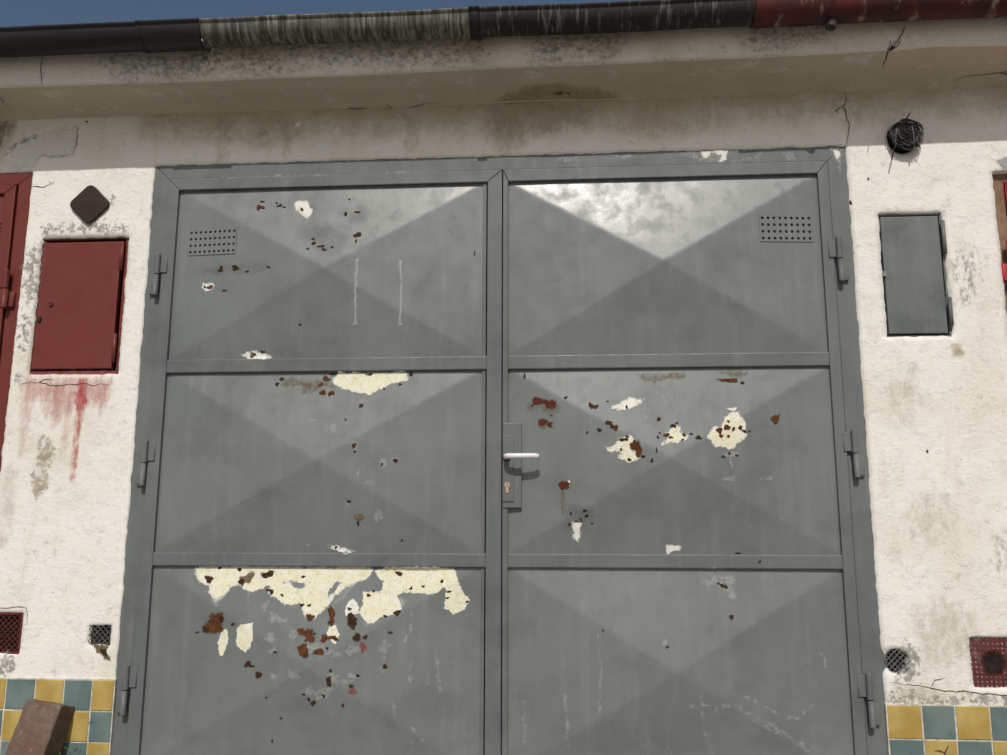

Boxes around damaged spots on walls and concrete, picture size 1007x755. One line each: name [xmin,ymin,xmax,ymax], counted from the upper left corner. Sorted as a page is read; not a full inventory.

crack [883,25,906,67]
crack [835,92,850,145]
peeling [318,371,413,407]
corrosion [531,396,568,427]
peeling [605,407,751,463]
spalling [31,435,55,497]
peeling [194,566,470,658]
peeling [217,622,262,679]